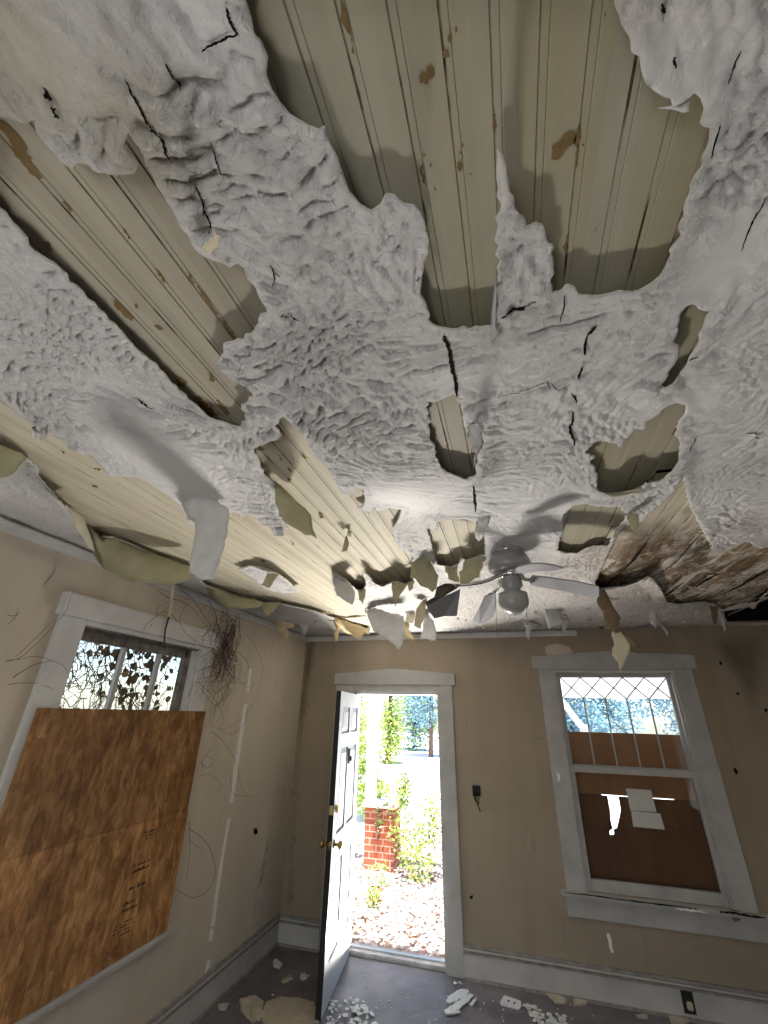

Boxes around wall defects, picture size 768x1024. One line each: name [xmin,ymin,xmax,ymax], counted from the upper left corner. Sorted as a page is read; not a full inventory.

crack [202,8,238,53]
crack [124,79,177,160]
crack [194,183,212,234]
peeling [246,0,709,347]
crack [741,198,768,252]
peeling [0,116,267,426]
crack [442,335,458,397]
crack [502,326,597,446]
peeling [660,304,709,388]
peeling [0,395,491,649]
peeling [557,403,768,671]
peeling [522,608,573,655]